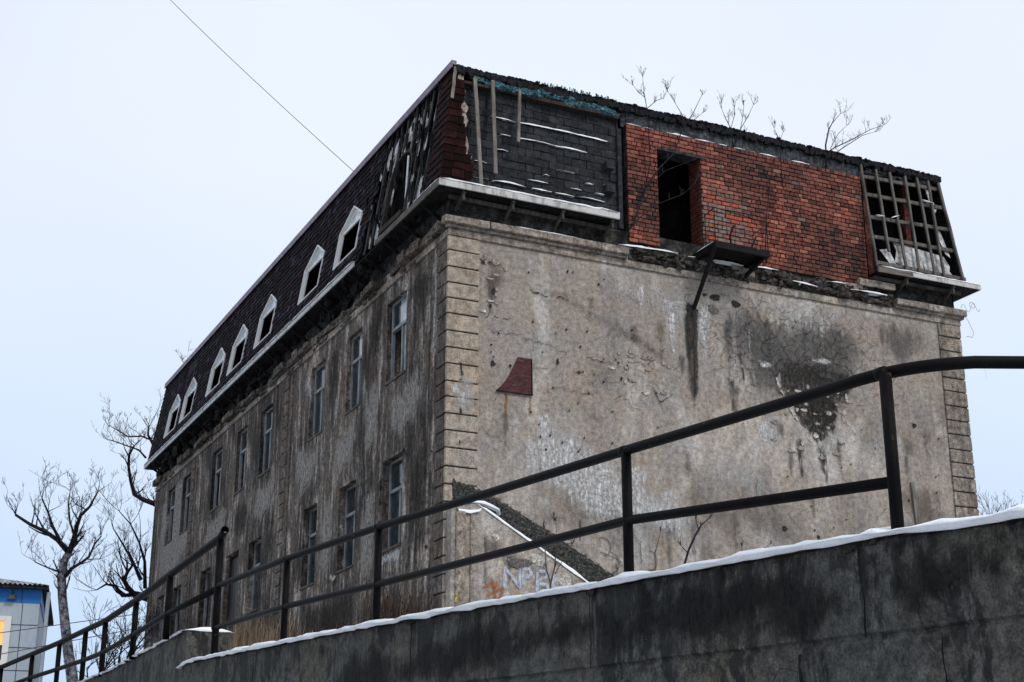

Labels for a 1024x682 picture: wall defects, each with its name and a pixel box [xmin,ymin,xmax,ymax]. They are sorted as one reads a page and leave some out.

water stain [328,352,340,432]
water stain [622,286,714,397]
crack [486,281,931,435]
flaking render [703,293,741,315]
peeling [730,265,755,279]
water stain [725,300,857,479]
peeling [834,278,896,294]
water stain [878,533,1006,614]
water stain [301,595,351,662]
water stain [334,550,866,682]